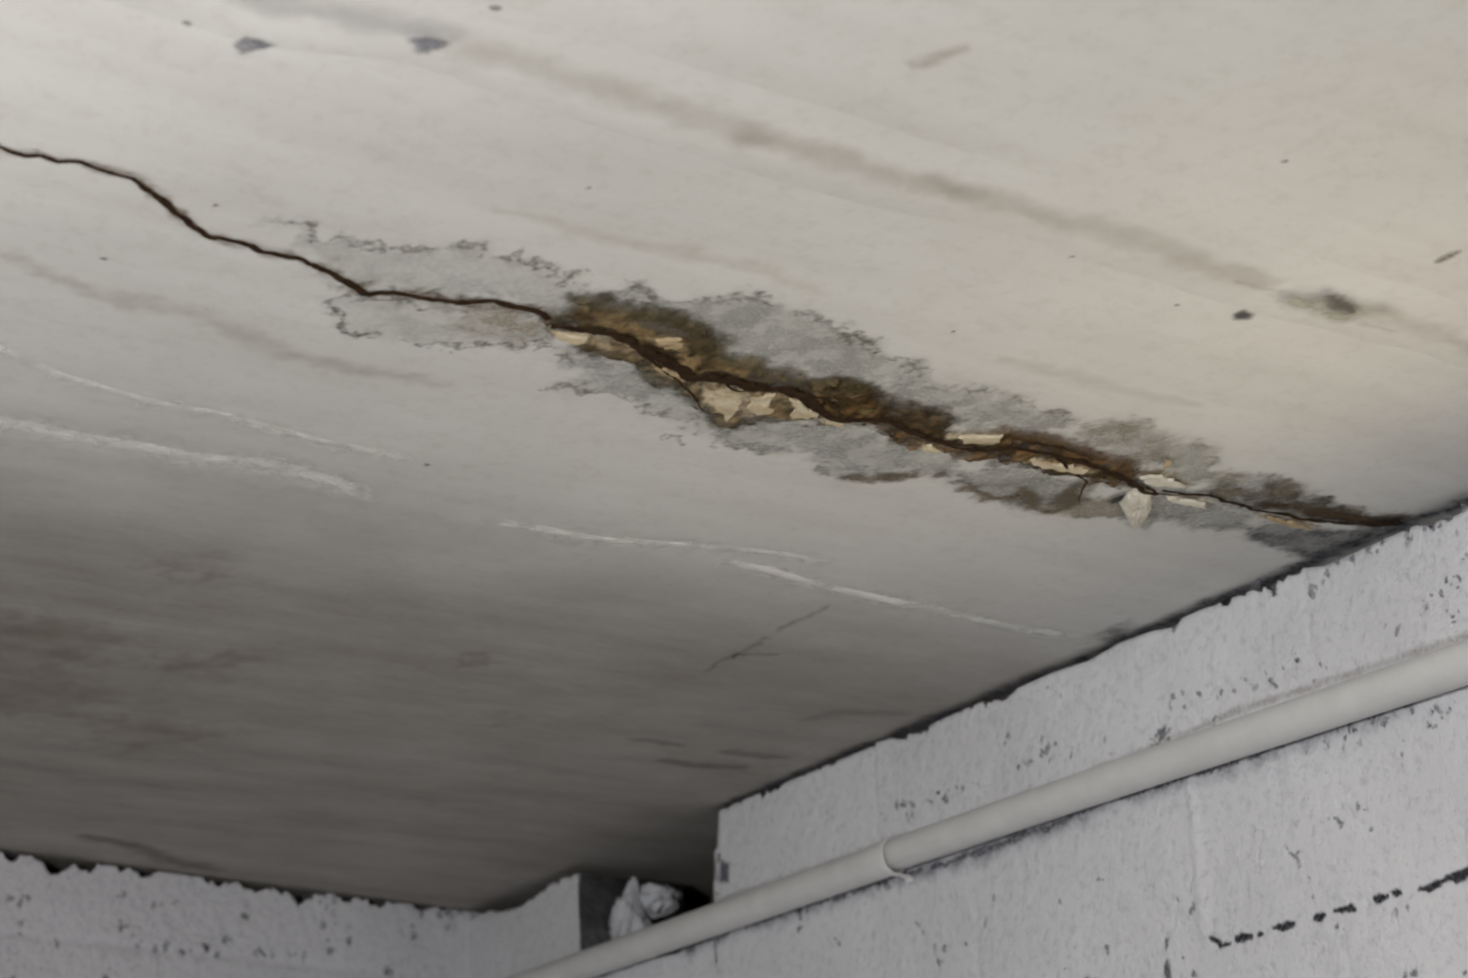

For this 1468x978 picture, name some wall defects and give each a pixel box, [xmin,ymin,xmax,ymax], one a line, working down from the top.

crack [0,146,1404,527]
spalling [544,295,1215,531]
spalling [1258,514,1318,530]
crack [1210,867,1468,948]